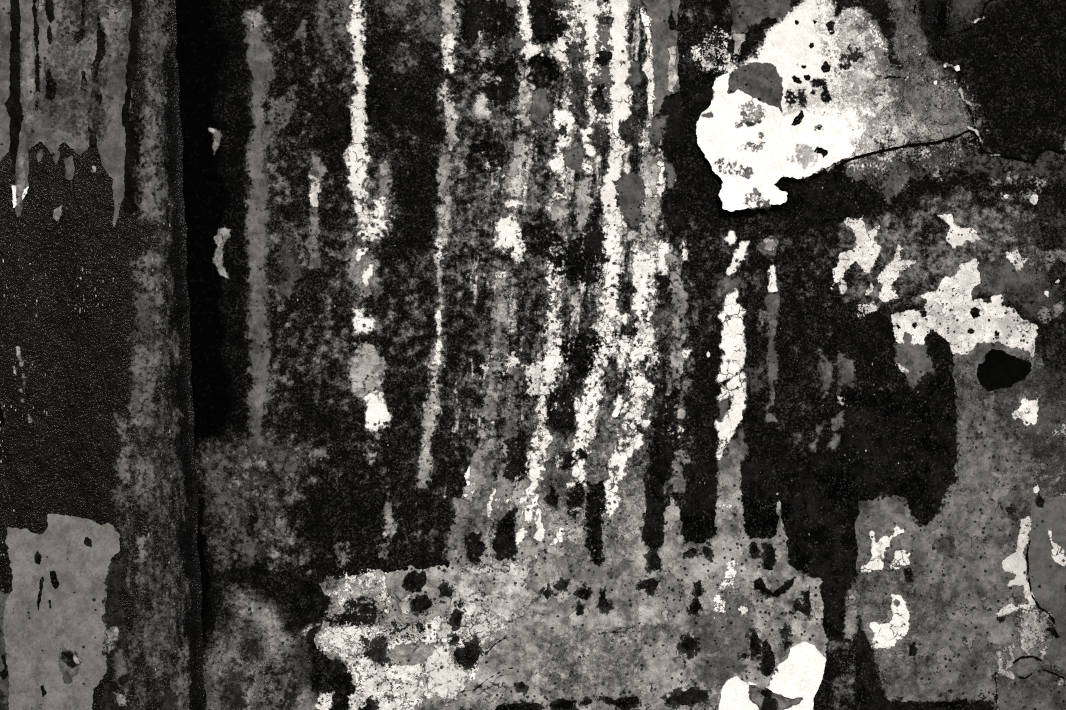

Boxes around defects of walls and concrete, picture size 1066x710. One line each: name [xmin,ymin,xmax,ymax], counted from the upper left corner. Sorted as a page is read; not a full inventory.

damp [5,0,172,229]
damp [325,99,353,150]
damp [364,43,402,126]
damp [483,0,579,132]
crack [842,0,1066,164]
damp [414,79,511,489]
damp [487,174,661,432]
peeling [529,0,1066,710]
peeling [0,514,120,710]
damp [464,436,530,565]
peeling [307,384,828,710]
damp [544,480,609,566]